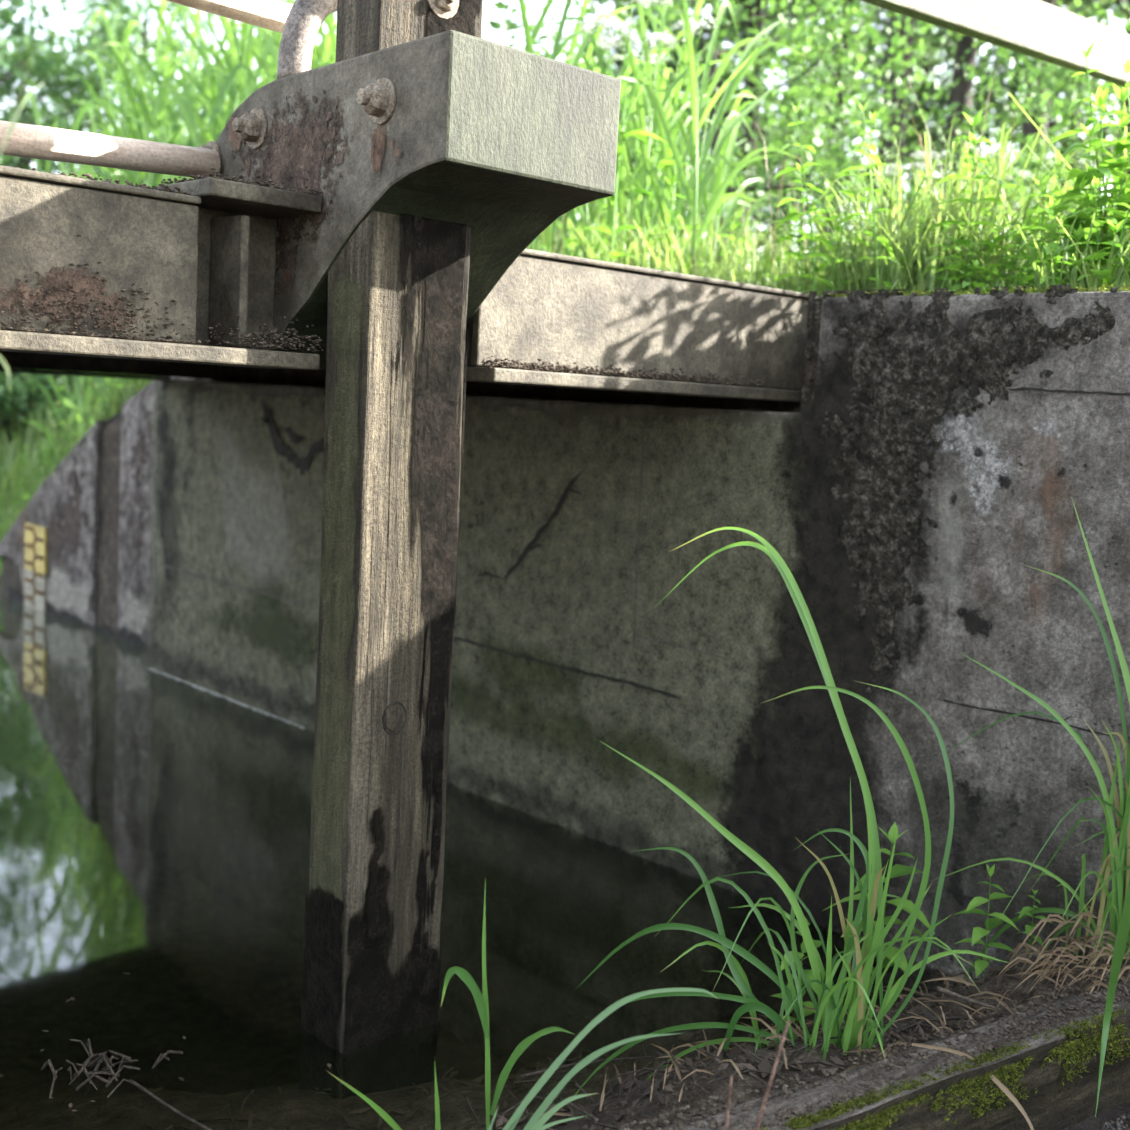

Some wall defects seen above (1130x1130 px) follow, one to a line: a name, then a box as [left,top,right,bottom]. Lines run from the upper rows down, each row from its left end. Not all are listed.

rust [370,125,400,172]
crack [477,471,582,580]
leakage [874,302,1031,593]
spalling [801,285,1115,671]
crack [454,637,680,698]
leakage [499,298,939,985]
crack [939,699,1110,736]
leakage [912,776,1070,941]